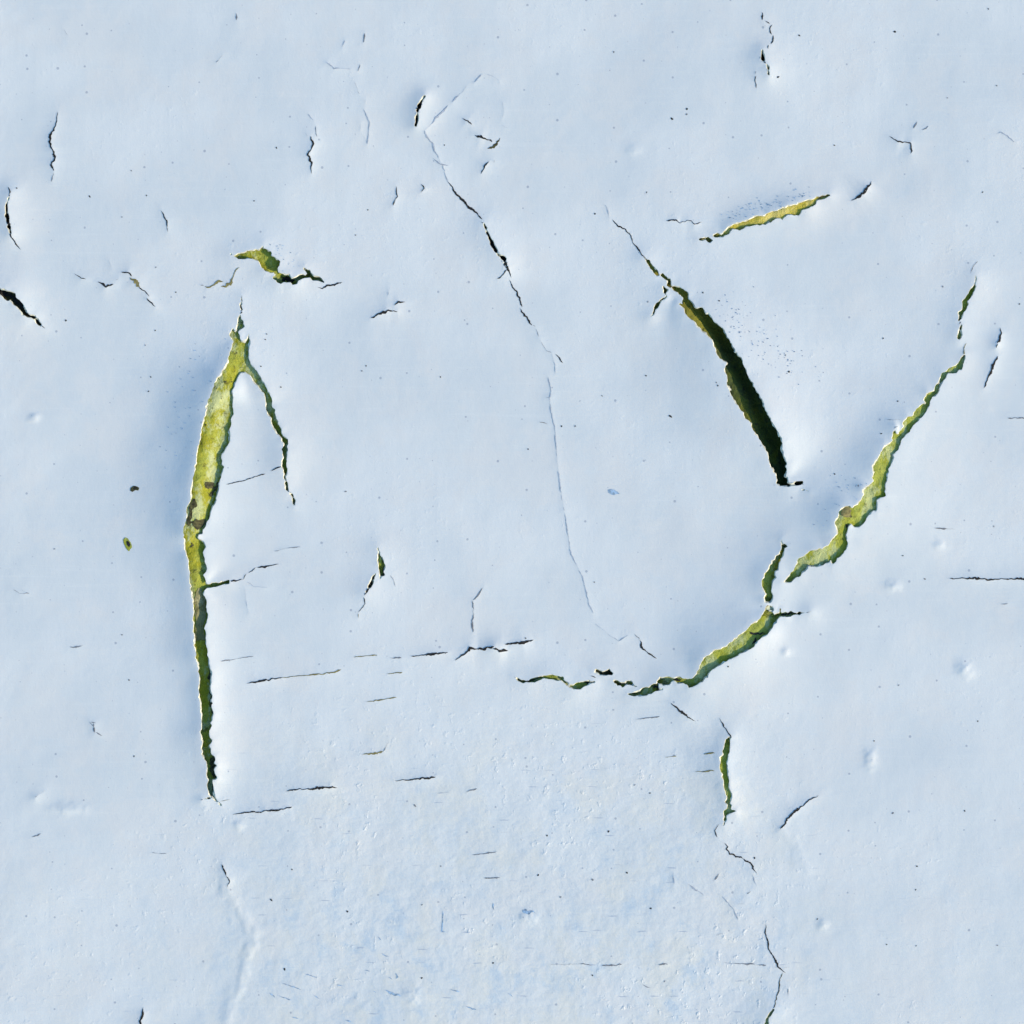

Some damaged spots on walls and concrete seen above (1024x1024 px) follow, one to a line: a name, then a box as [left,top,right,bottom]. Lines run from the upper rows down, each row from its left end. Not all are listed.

crack [755,13,774,86]
crack [48,113,58,182]
crack [4,187,21,250]
crack [0,288,43,327]
crack [984,328,1002,388]
crack [393,73,977,721]
crack [183,246,533,815]
crack [950,575,1024,583]
crack [673,722,757,919]
crack [780,796,818,829]
crack [725,929,787,1024]